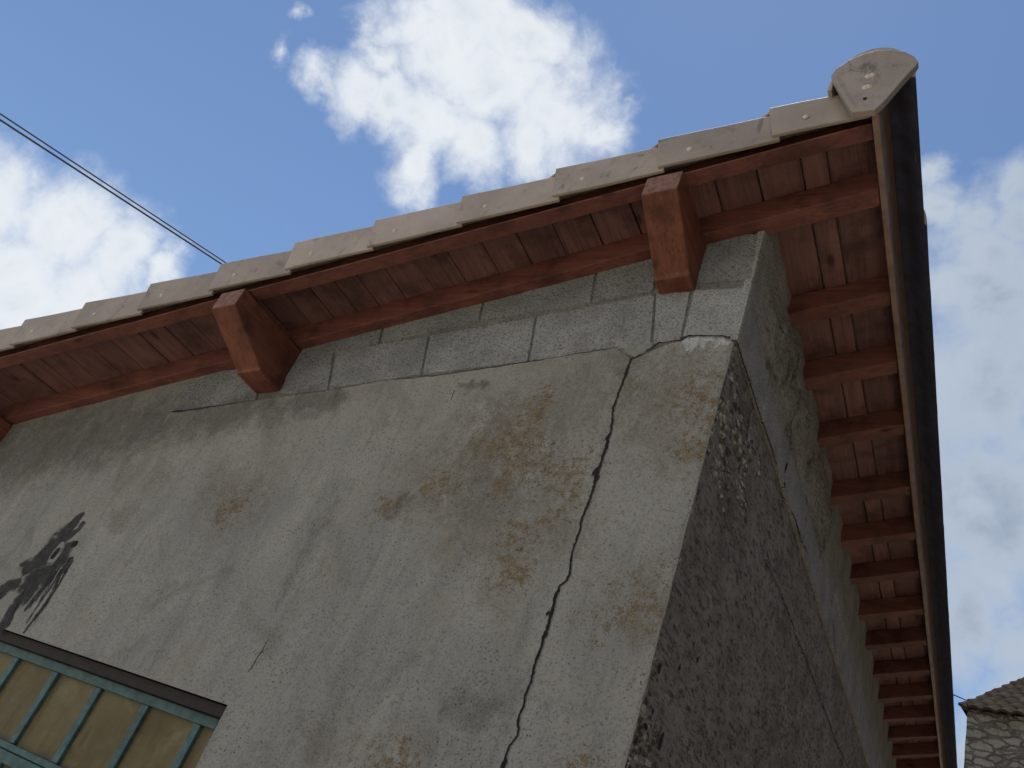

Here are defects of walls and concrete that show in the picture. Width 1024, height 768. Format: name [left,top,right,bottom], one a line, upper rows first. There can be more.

water stain [0,512,85,634]
crack [171,402,239,412]
corrosion [469,384,605,593]
crack [404,335,808,768]